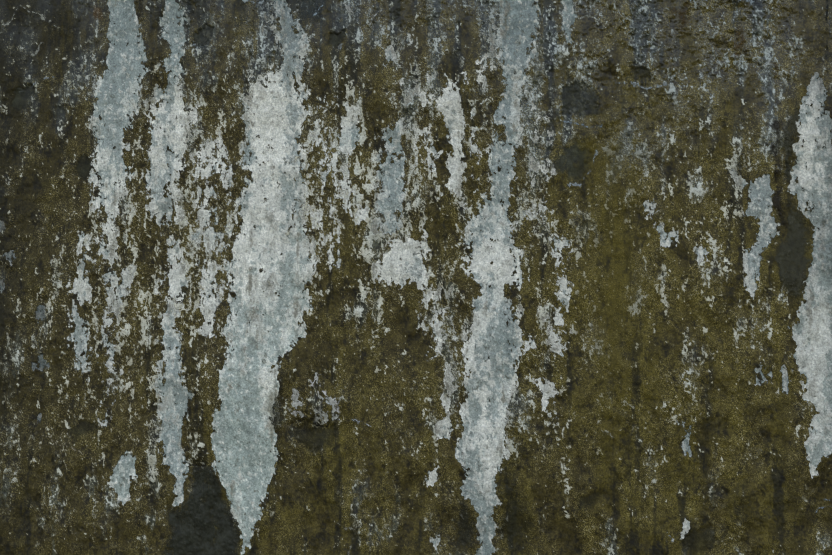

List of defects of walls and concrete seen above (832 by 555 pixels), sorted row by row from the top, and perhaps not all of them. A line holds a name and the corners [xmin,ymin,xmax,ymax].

peeling [383,40,397,67]
spalling [76,154,92,180]
spalling [529,91,598,187]
peeling [186,131,236,338]
peeling [306,53,496,440]
peeling [521,201,574,357]
peeling [70,264,136,441]
spalling [289,372,340,452]
peeling [532,378,559,425]
peeling [754,361,791,394]
peeling [107,451,138,506]
peeling [425,464,439,487]